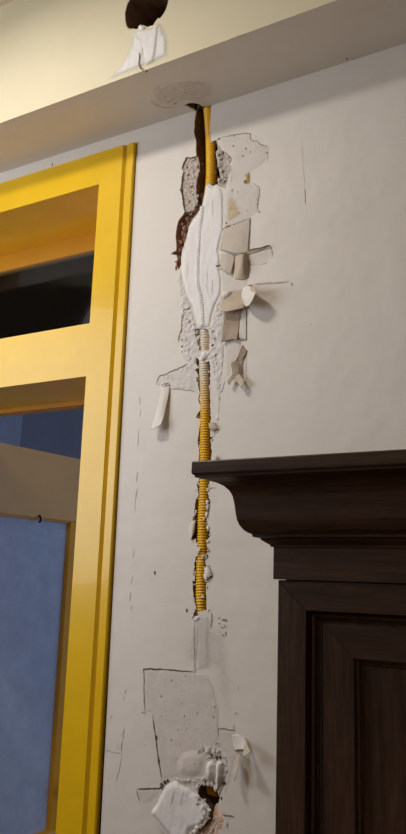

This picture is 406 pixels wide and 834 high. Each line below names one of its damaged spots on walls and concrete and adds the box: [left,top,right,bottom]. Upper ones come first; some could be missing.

peeling [216,133,268,227]
flaking render [151,157,292,442]
peeling [186,483,212,613]
peeling [136,779,169,803]
peeling [192,728,251,834]